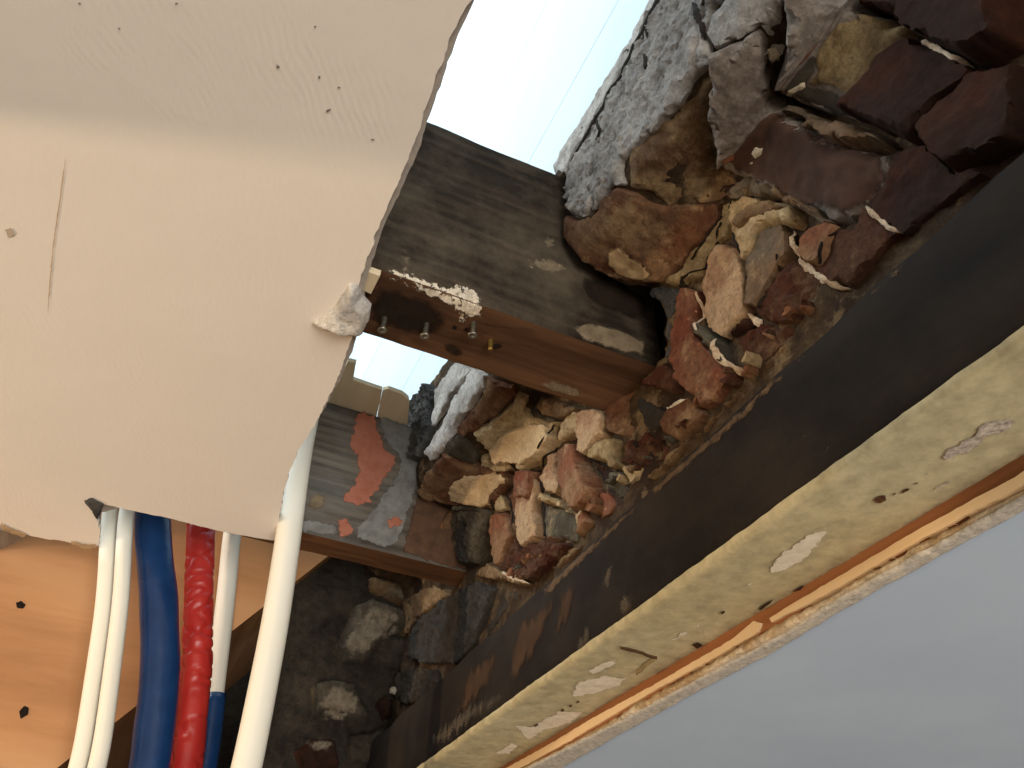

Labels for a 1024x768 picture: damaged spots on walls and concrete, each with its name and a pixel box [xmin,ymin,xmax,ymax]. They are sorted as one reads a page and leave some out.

crack [570,0,659,162]
crack [48,158,66,308]
spalling [312,283,372,336]
leakage [373,268,482,334]
spalling [525,490,1024,768]
peeling [496,711,582,754]